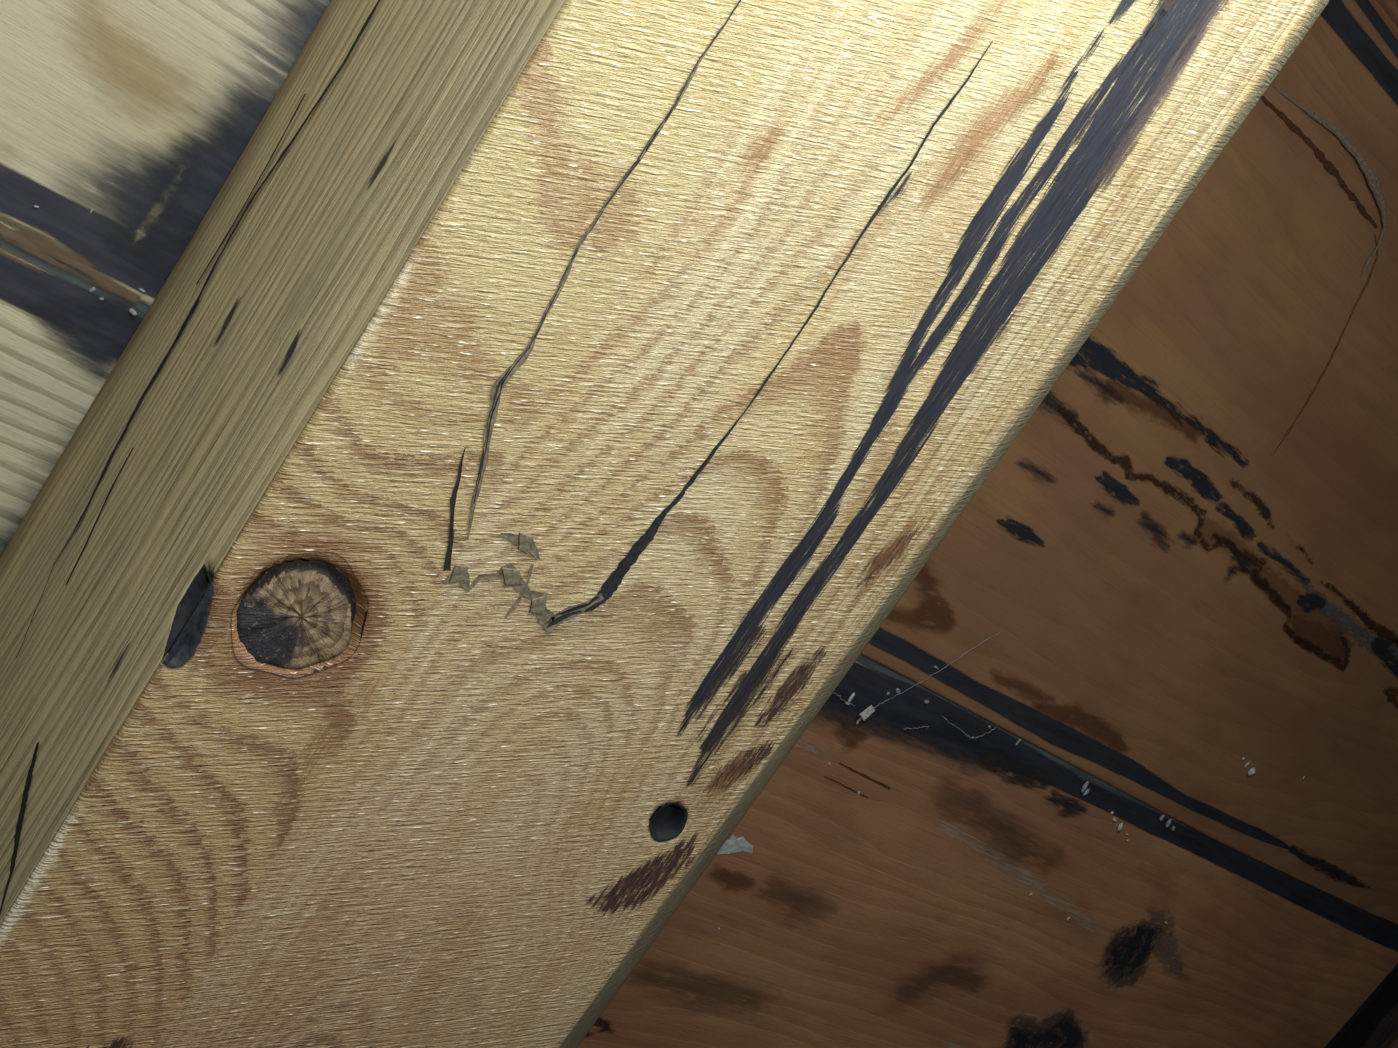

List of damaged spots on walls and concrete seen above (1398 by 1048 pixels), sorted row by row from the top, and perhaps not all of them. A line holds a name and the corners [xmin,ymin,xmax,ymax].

damp [0,0,331,378]
crack [443,0,993,633]
damp [677,0,1228,807]
damp [1041,337,1398,708]
crack [1260,95,1379,456]
damp [587,833,697,915]
damp [817,627,1398,1048]